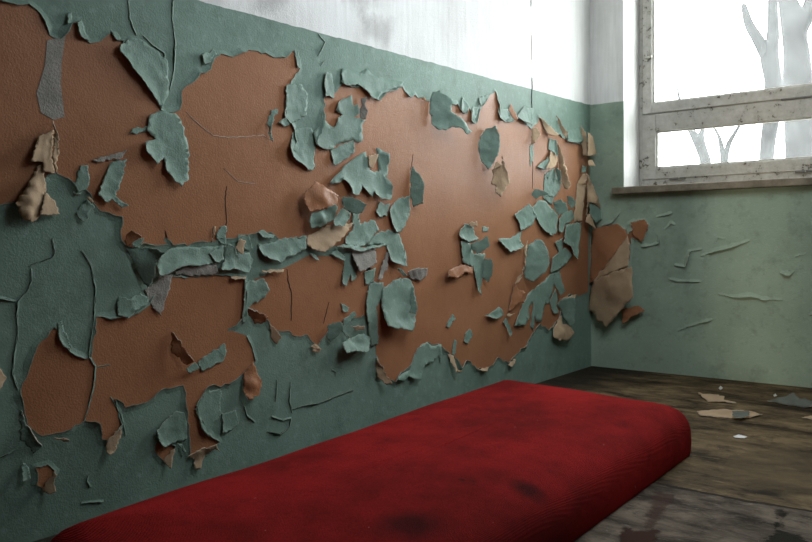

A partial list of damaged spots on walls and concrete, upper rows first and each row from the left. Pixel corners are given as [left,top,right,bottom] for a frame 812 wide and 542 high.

peeling [0,0,651,495]